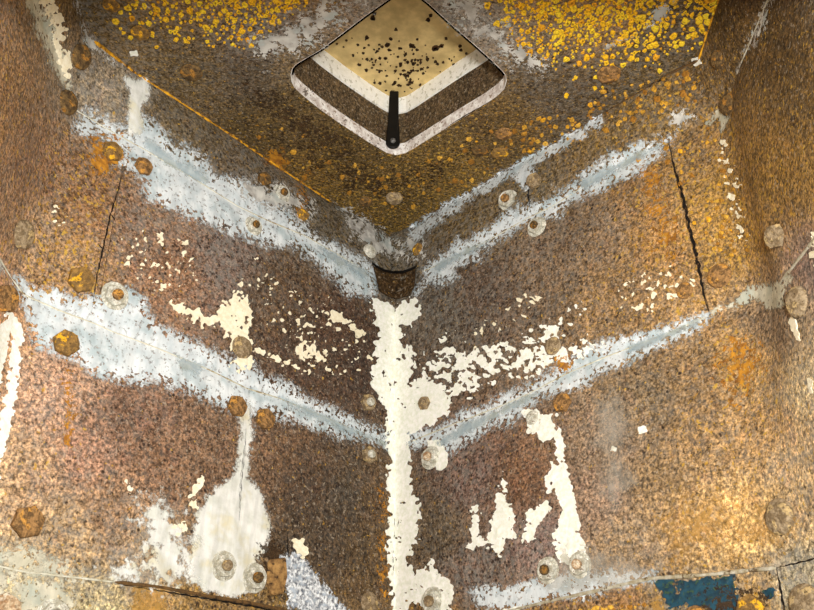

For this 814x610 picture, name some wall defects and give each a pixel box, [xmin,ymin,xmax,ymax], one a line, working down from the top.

peeling [38,0,73,79]
corrosion [112,0,309,50]
corrosion [215,0,718,225]
crack [91,171,124,312]
peeling [121,230,198,291]
crack [669,145,710,315]
corrosion [629,138,754,290]
peeling [0,311,26,463]
peeling [169,273,607,610]
crack [118,584,271,610]
peeling [654,574,740,610]
crack [776,558,814,610]